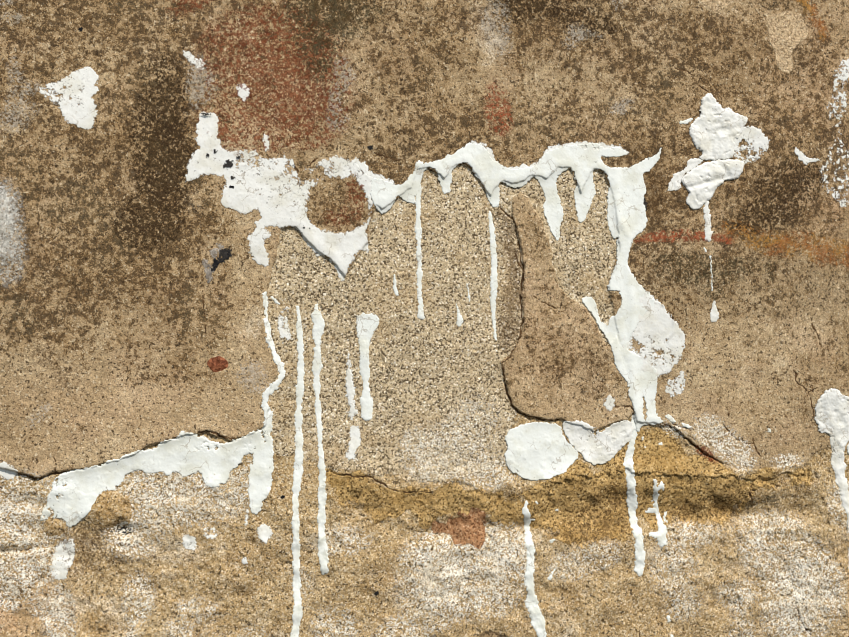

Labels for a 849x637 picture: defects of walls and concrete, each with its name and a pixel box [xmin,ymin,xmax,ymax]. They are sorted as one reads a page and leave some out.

corrosion [202,8,349,149]
corrosion [634,221,849,268]
spalling [40,93,814,581]
crack [499,207,570,421]
corrosion [207,356,228,372]
crack [198,430,234,440]
crack [16,456,76,480]
crack [326,471,434,493]